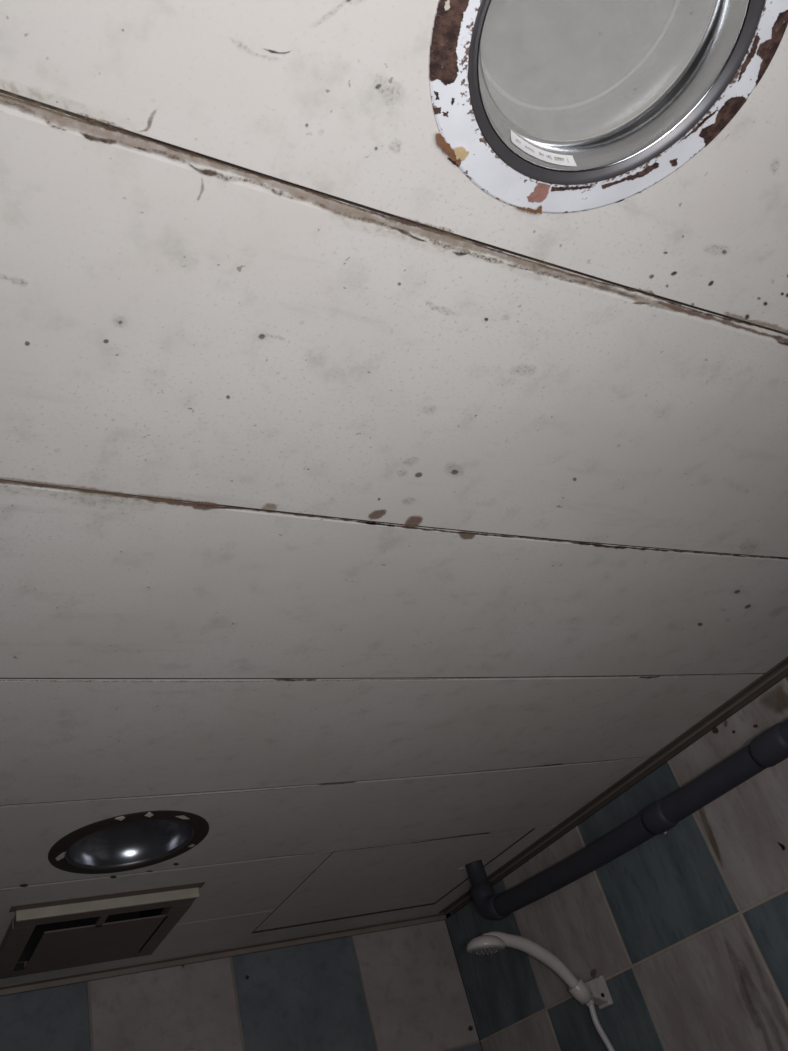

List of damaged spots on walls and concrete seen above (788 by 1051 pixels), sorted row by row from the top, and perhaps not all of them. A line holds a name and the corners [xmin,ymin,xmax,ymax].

rust [430,0,469,117]
rust [436,133,462,167]
peeling [453,147,469,160]